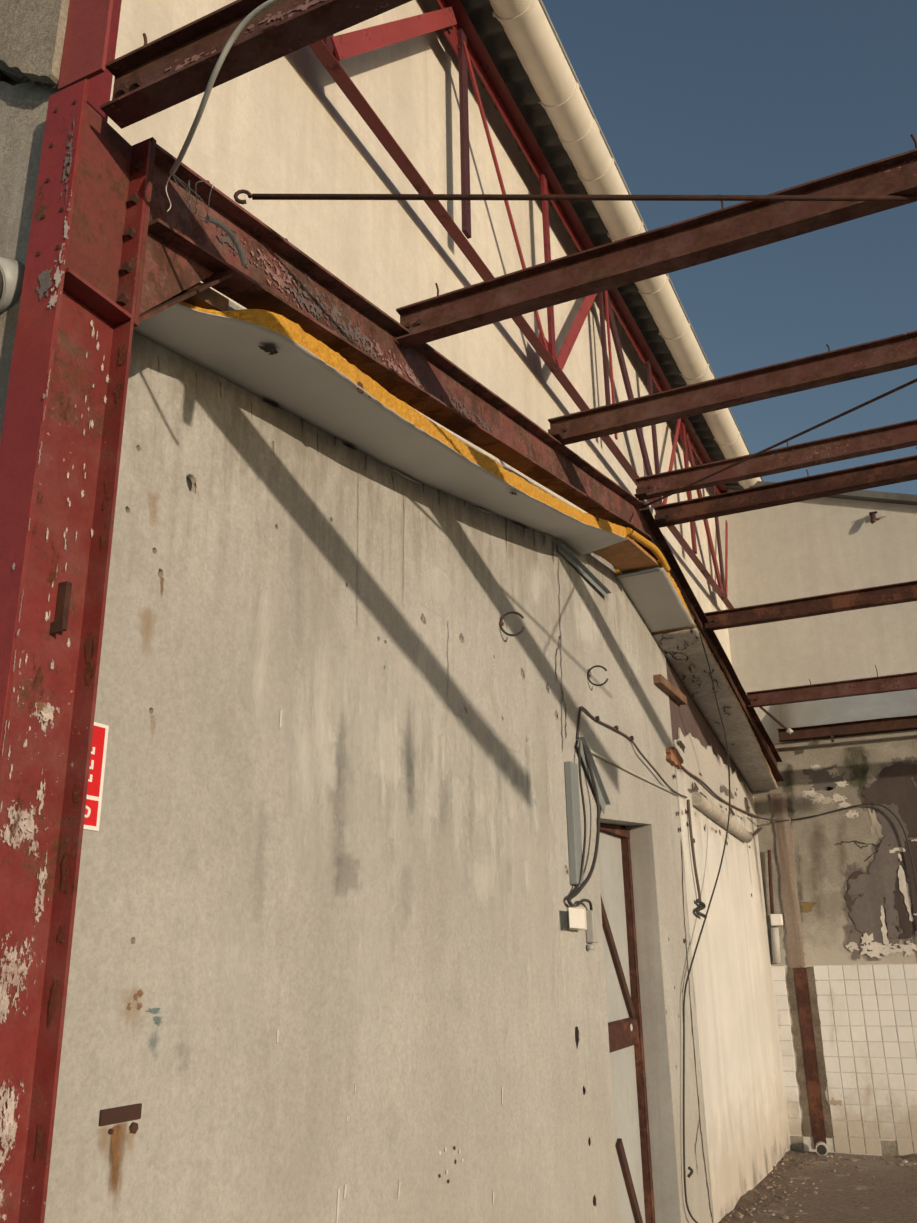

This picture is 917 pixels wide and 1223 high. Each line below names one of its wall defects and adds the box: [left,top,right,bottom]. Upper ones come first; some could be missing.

peeling [75,320,109,434]
peeling [45,528,93,622]
peeling [2,701,60,779]
peeling [0,769,49,1024]
peeling [795,758,917,961]
peeling [0,1081,24,1221]
corrosion [110,1124,126,1186]